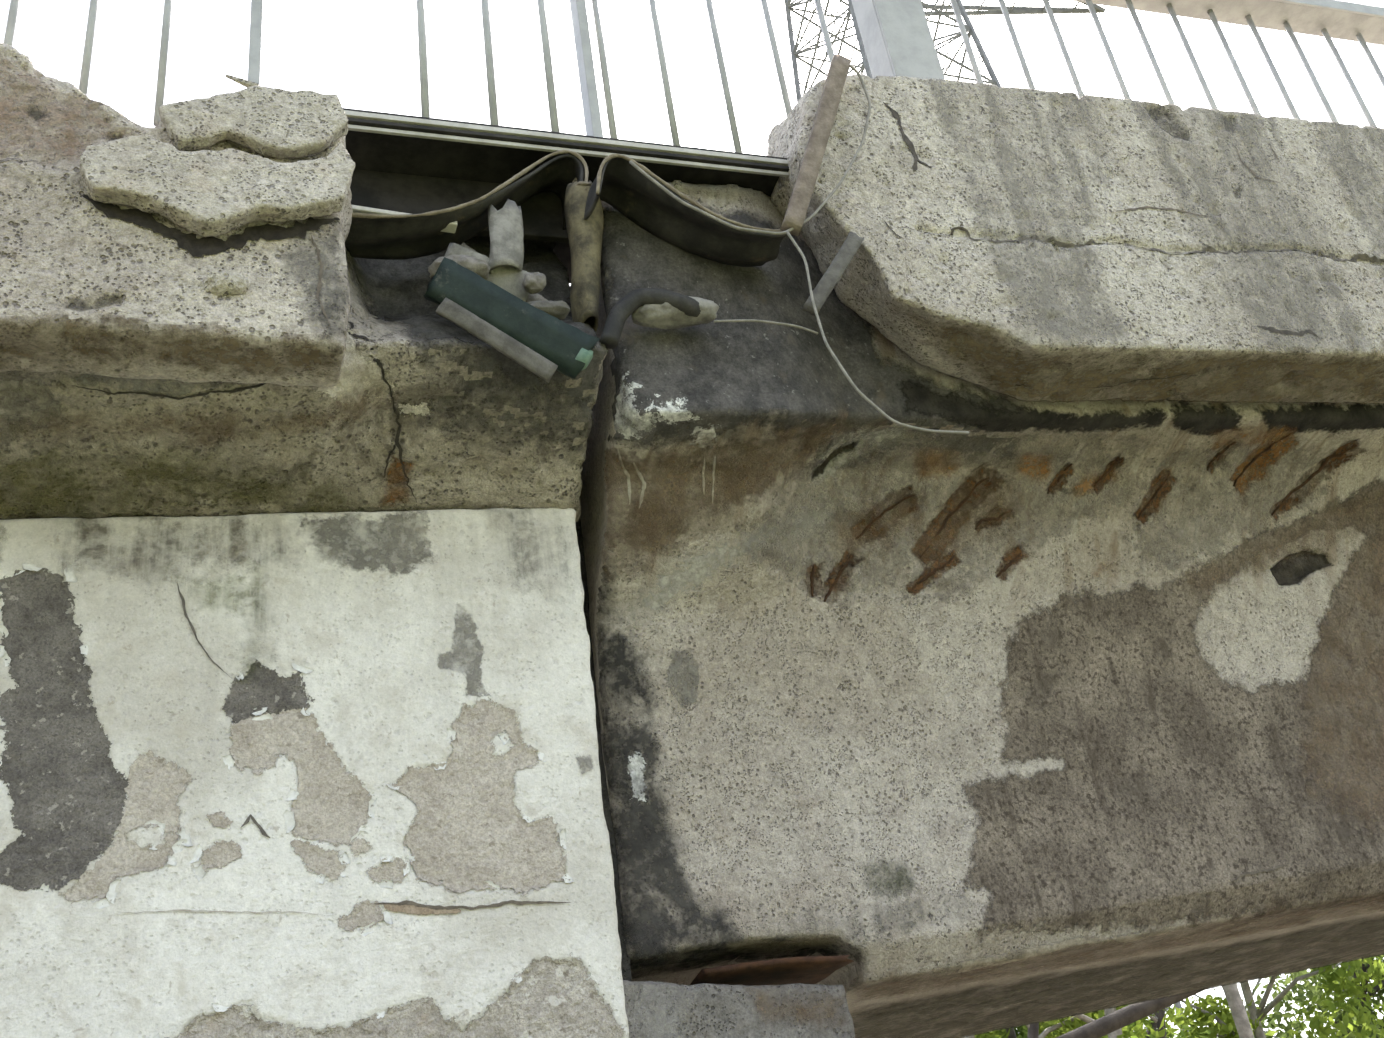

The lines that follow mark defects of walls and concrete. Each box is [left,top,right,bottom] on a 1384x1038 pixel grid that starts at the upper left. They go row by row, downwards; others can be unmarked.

peeling [0,59,355,237]
spalling [1148,106,1189,141]
crack [884,206,1384,263]
spalling [66,296,120,310]
crack [76,194,417,502]
peeling [220,614,574,936]
peeling [577,757,593,774]
leakage [596,479,1384,1000]
peeling [153,954,624,1038]